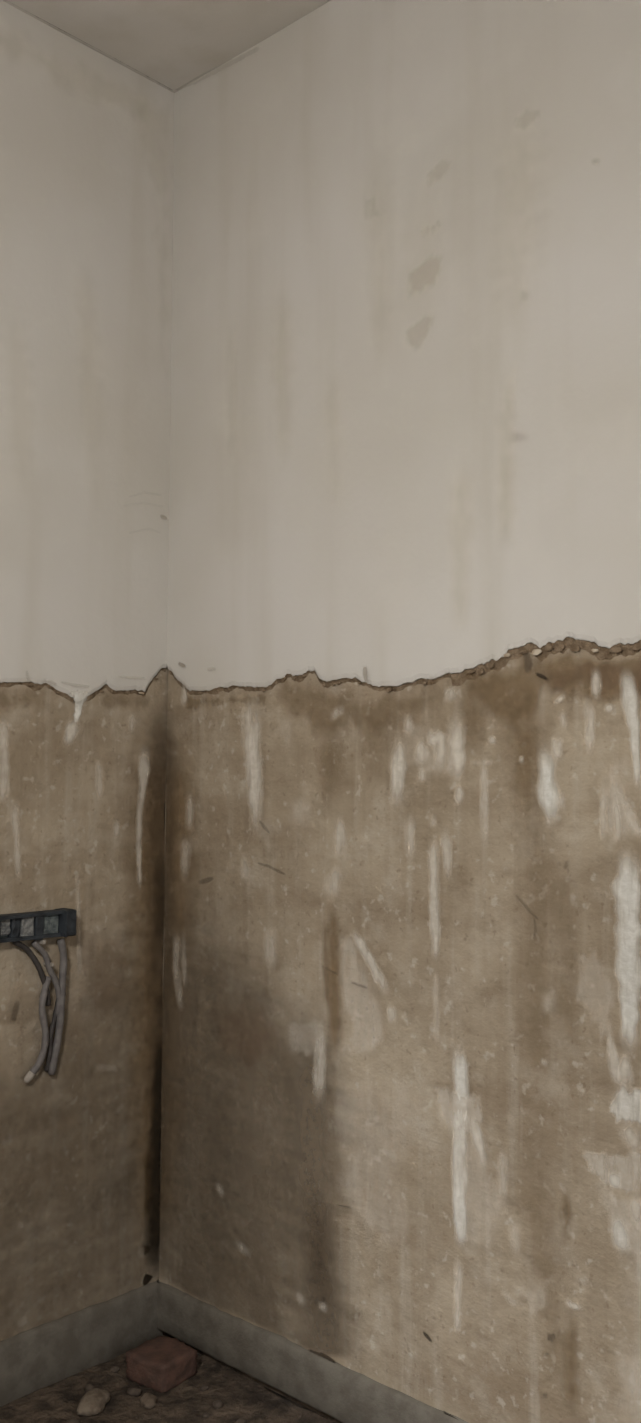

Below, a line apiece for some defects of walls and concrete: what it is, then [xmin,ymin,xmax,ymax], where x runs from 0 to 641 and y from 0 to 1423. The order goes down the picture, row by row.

efflorescence [66,691,88,742]
damp [245,713,260,815]
efflorescence [393,728,463,801]
efflorescence [430,841,449,951]
damp [137,759,343,1353]
flaking render [0,637,641,1423]
damp [357,939,383,984]
efflorescence [609,862,641,1121]
efflorescence [454,1058,483,1239]